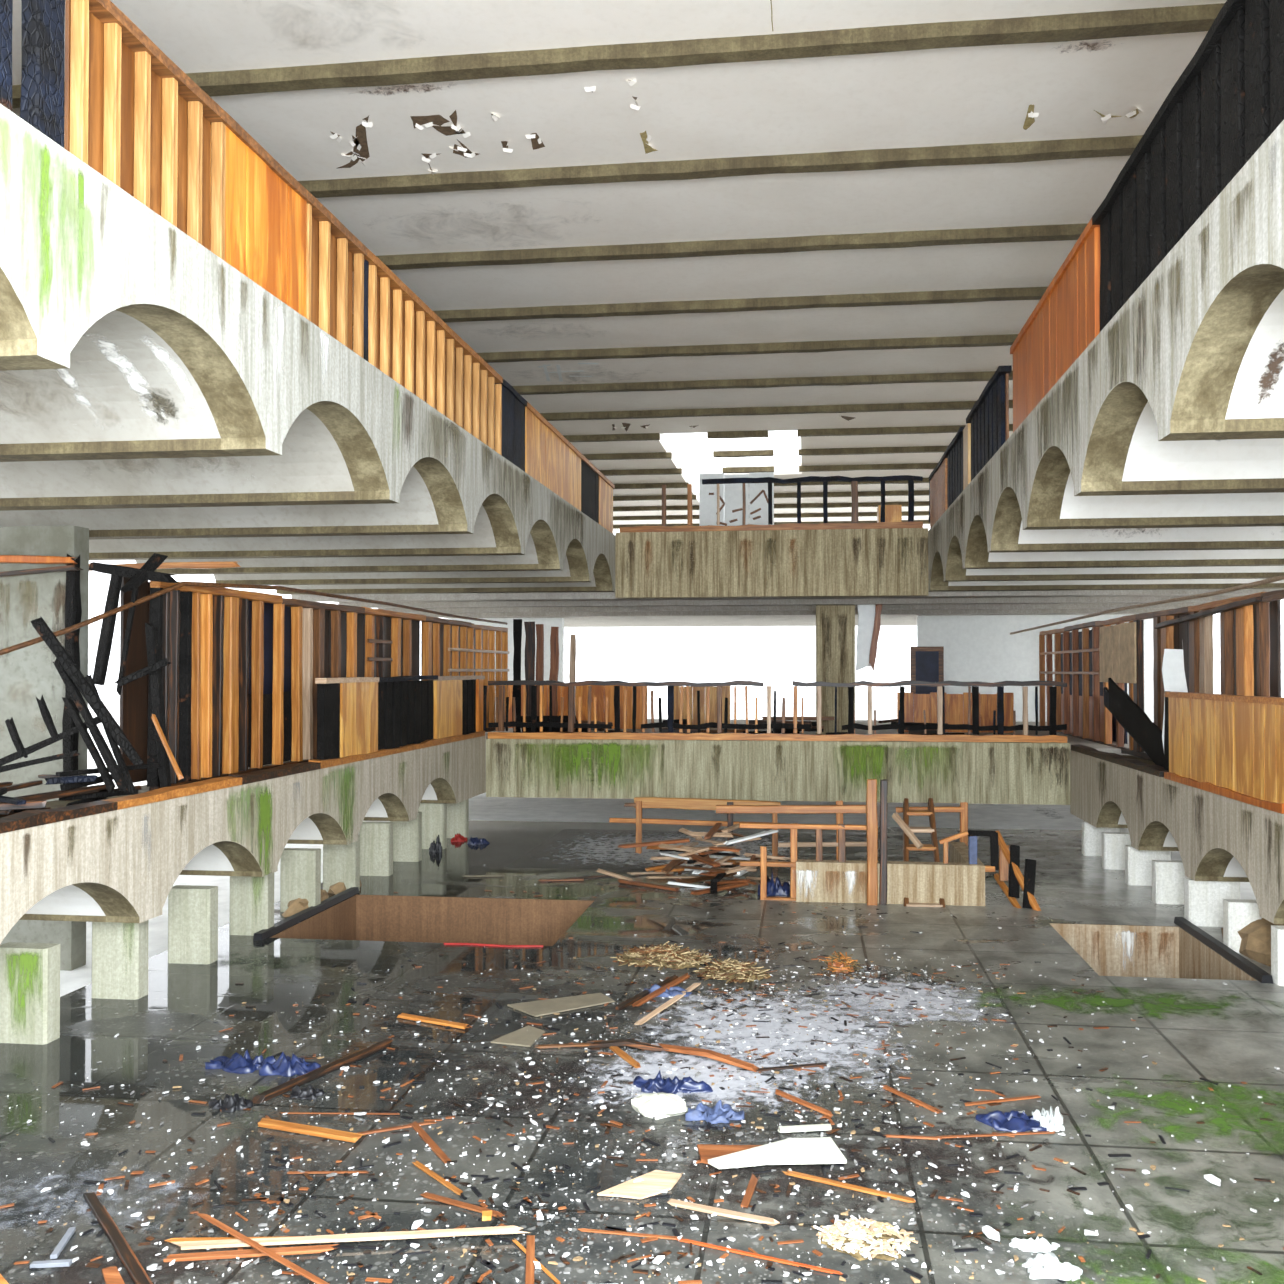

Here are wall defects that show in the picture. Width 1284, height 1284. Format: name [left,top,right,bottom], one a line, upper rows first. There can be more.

peeling [330,116,373,169]
peeling [410,110,479,175]
peeling [525,133,545,150]
water stain [0,121,94,291]
water stain [1110,259,1180,382]
spalling [141,391,178,420]
peeling [1258,343,1284,404]
water stain [901,345,1096,574]
water stain [497,742,664,786]
water stain [841,745,954,784]
water stain [227,786,273,875]
water stain [1243,811,1282,889]